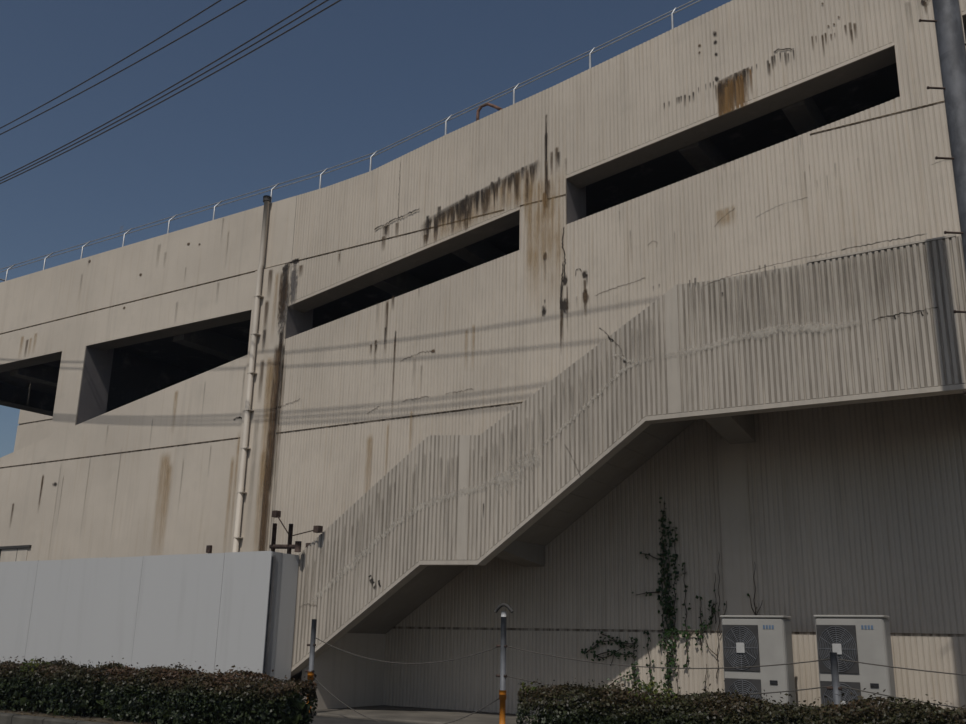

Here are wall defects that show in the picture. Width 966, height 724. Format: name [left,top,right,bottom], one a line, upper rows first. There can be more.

rust [718,68,752,116]
leakage [375,128,559,240]